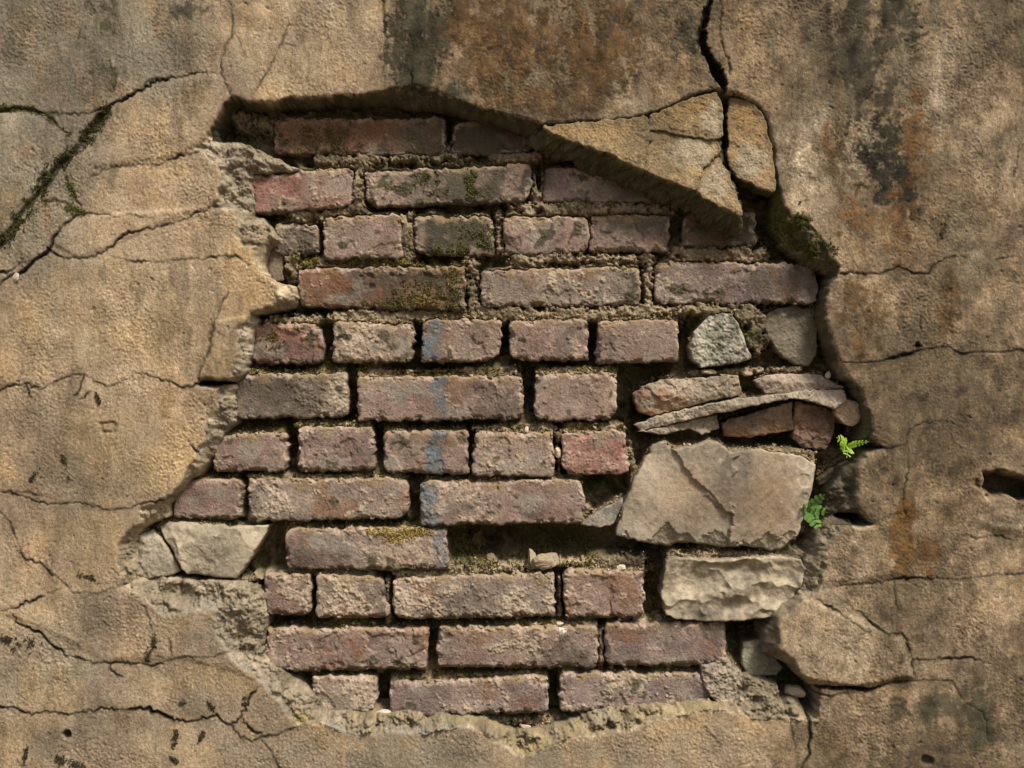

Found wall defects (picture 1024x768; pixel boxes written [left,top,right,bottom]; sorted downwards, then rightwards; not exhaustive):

crack [697,0,730,94]
water stain [826,0,932,220]
crack [0,73,200,282]
crack [871,233,942,274]
crack [175,380,236,388]
peeling [198,85,876,617]
crack [854,342,966,363]
spalling [118,407,821,757]
crack [868,576,934,604]
crack [0,692,291,745]